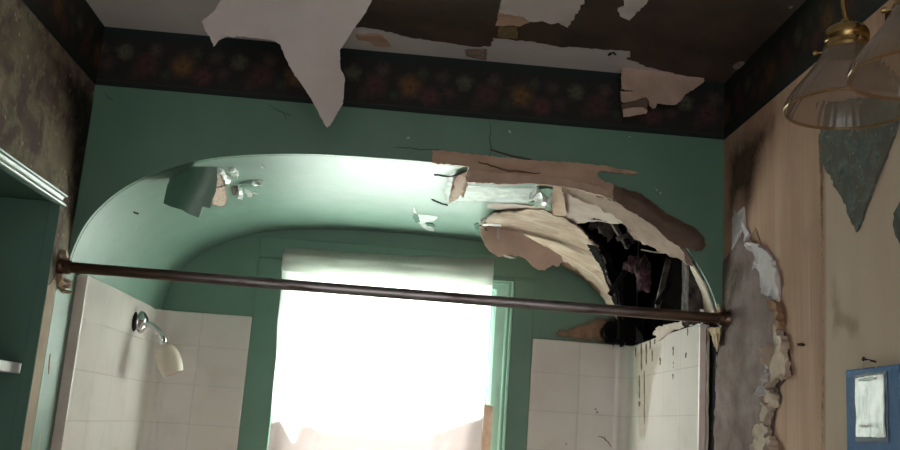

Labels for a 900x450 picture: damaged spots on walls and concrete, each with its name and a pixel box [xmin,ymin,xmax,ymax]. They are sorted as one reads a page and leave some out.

peeling [356,0,806,83]
water stain [68,80,93,218]
peeling [164,166,263,218]
peeling [413,207,438,231]
water stain [730,133,764,204]
spalling [431,172,775,450]